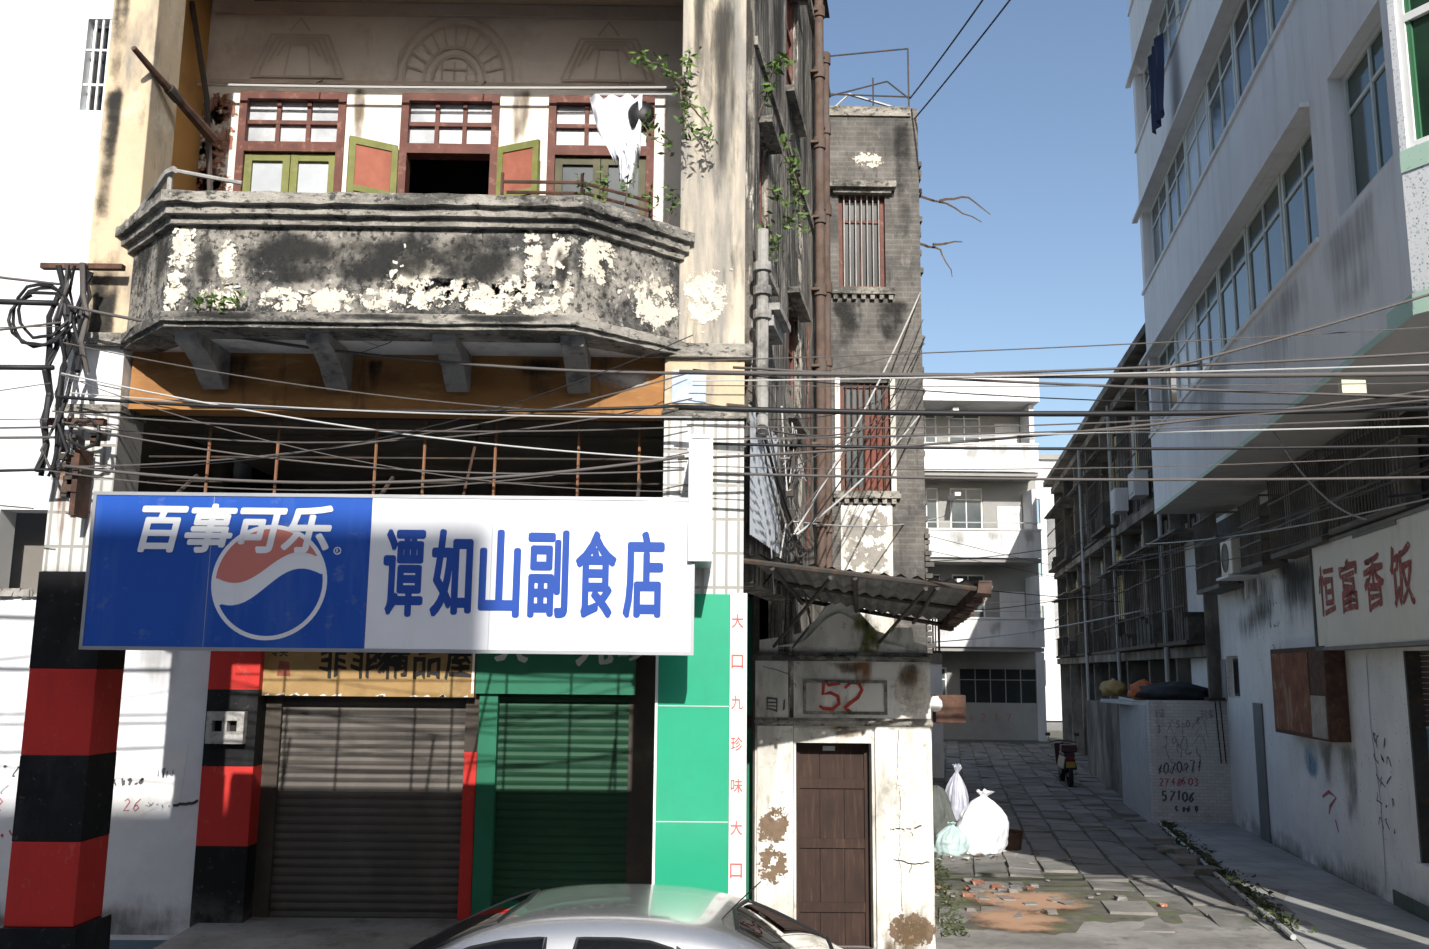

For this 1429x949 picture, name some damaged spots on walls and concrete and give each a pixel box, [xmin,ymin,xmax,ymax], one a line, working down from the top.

leakage [695,0,734,160]
leakage [97,88,122,212]
leakage [87,273,116,332]
leakage [138,237,165,286]
mould [197,249,214,279]
mould [251,236,508,282]
peeling [162,227,733,333]
mould [555,251,568,288]